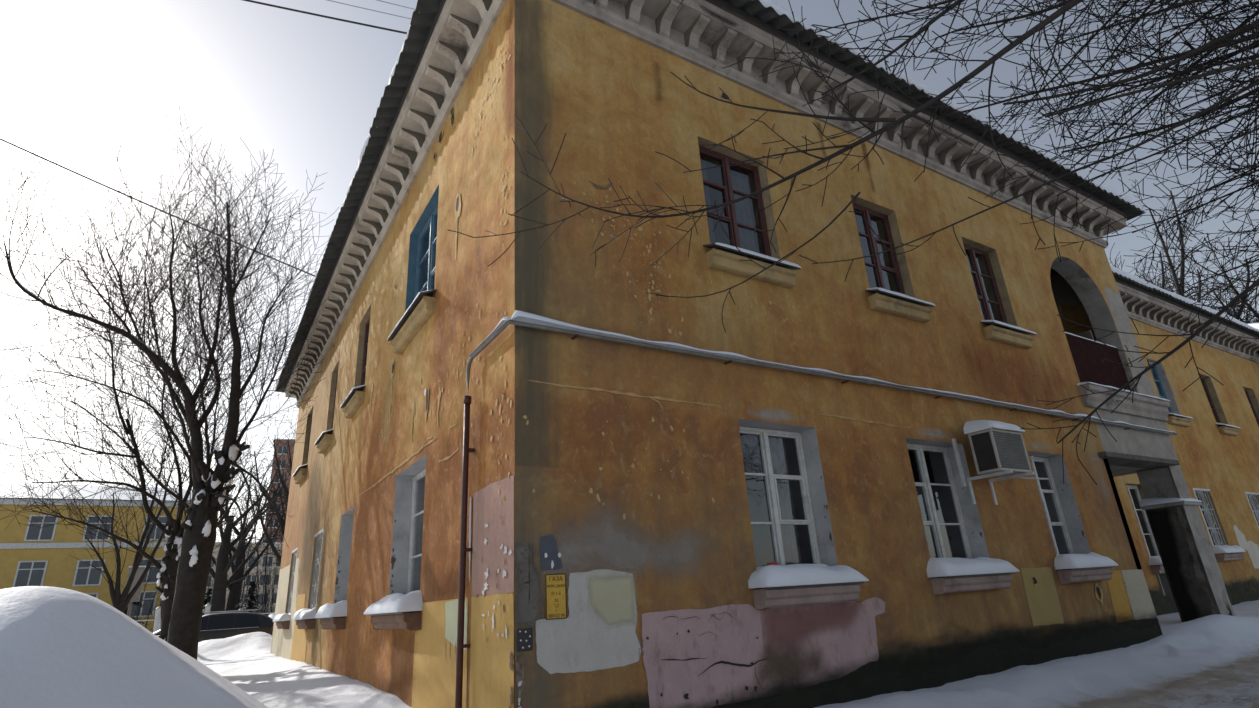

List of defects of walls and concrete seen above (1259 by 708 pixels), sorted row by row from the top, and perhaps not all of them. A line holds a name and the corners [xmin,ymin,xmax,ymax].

peeling [473,355,529,504]
peeling [1233,525,1259,569]
crack [660,658,767,690]
damp [761,603,857,680]